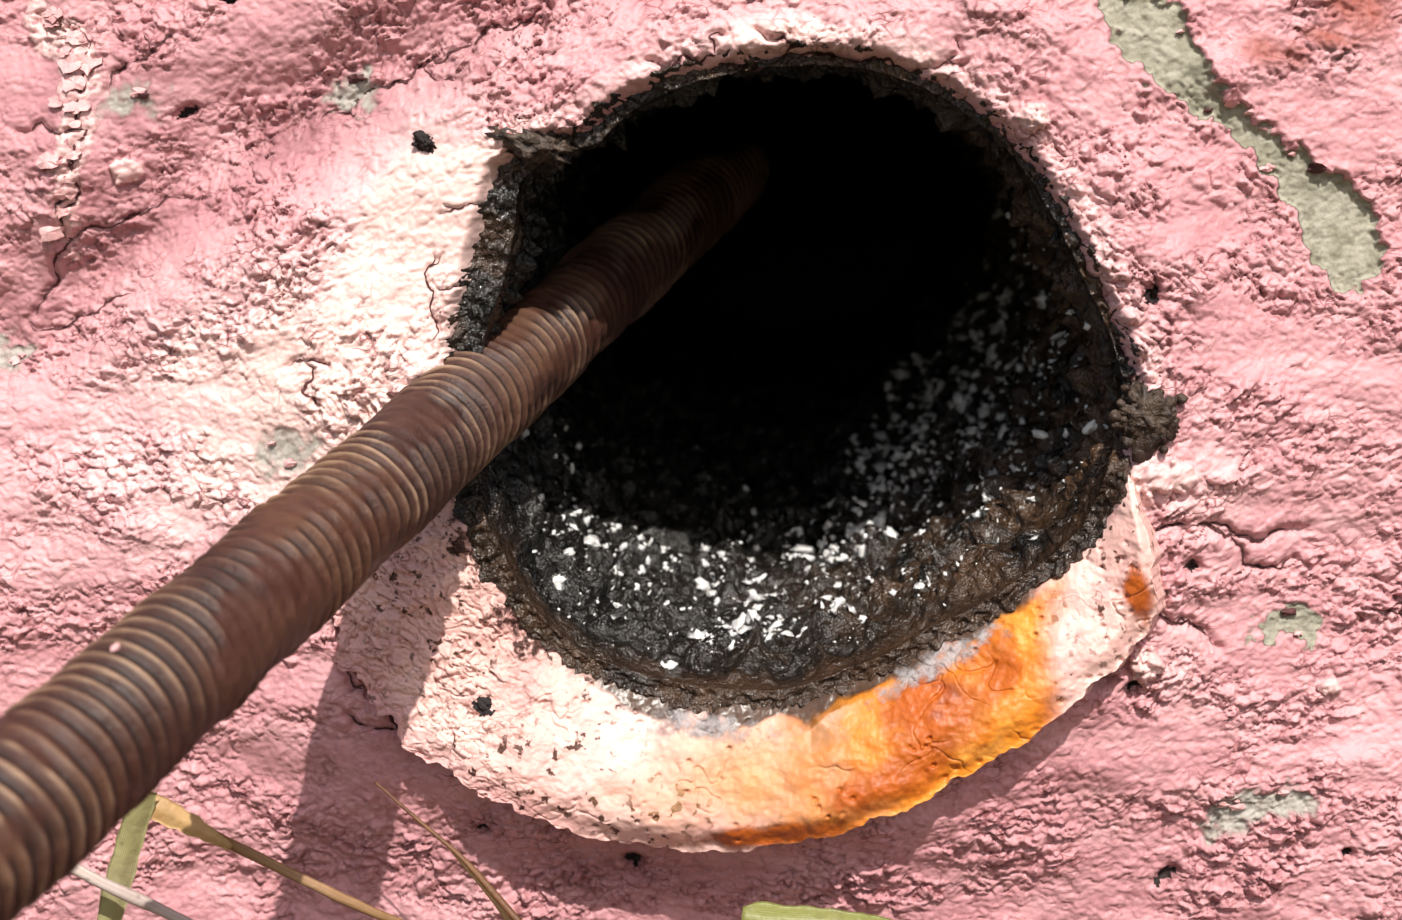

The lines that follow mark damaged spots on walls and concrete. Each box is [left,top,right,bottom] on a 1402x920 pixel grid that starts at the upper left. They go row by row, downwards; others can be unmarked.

peeling [1098,0,1388,295]
crack [19,30,189,331]
spalling [1144,284,1159,305]
crack [1155,522,1293,569]
corrosion [1123,566,1152,617]
crack [1159,613,1215,645]
peeling [1245,602,1323,651]
corrosion [696,596,1054,847]
peeling [1200,789,1319,846]